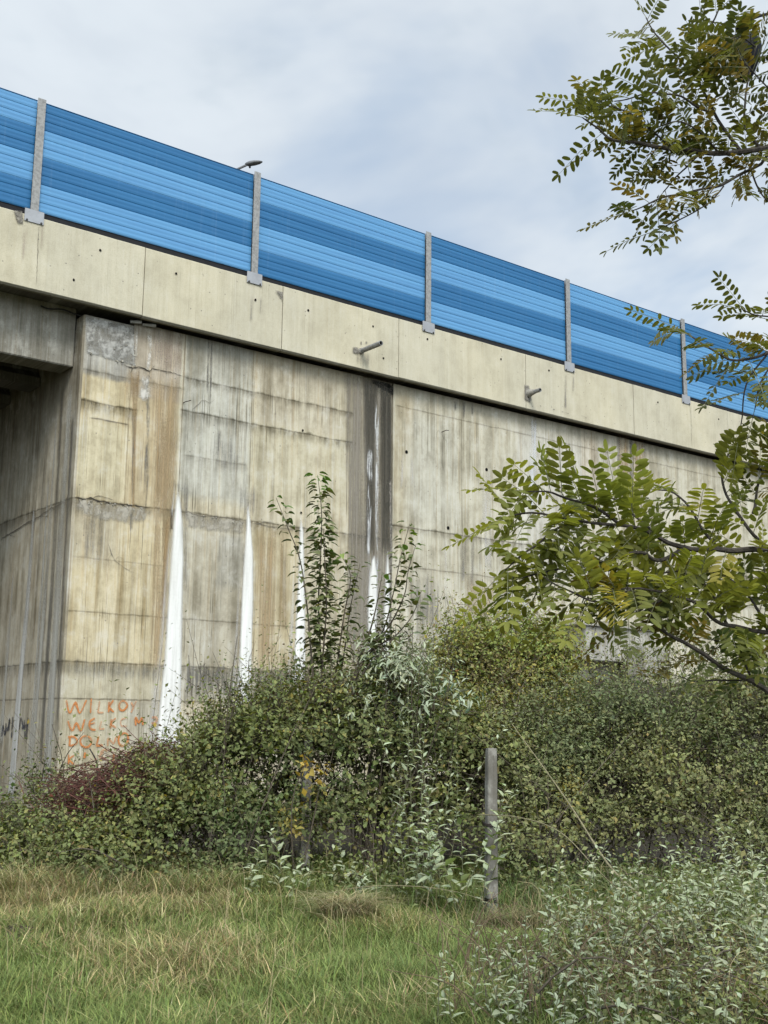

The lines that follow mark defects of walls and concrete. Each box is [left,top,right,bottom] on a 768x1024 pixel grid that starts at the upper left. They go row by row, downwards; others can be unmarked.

peeling [86,318,151,399]
crack [2,453,149,538]
damp [153,494,305,747]
damp [347,378,391,662]